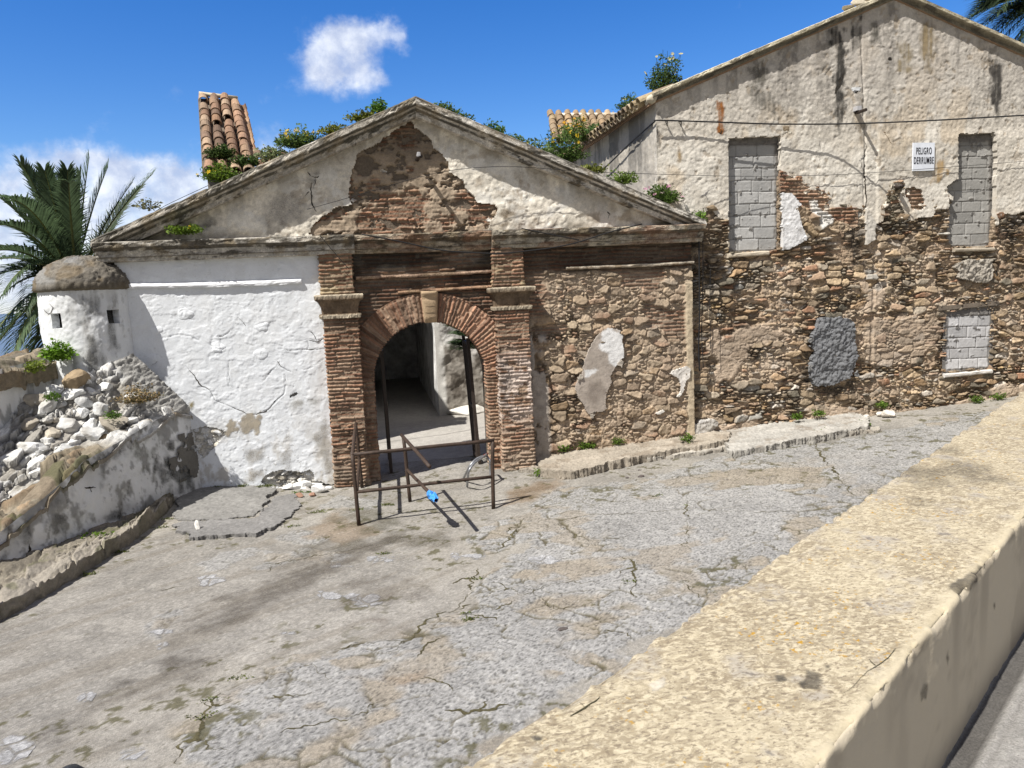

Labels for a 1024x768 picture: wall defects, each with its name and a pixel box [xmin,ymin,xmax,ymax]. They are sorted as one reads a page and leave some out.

water stain [829,16,878,128]
spalling [309,121,497,236]
spalling [778,170,926,251]
crack [191,332,322,415]
spalling [169,411,262,483]
crack [496,513,532,553]
crack [560,495,727,598]
crack [273,568,598,715]
crack [284,702,378,730]